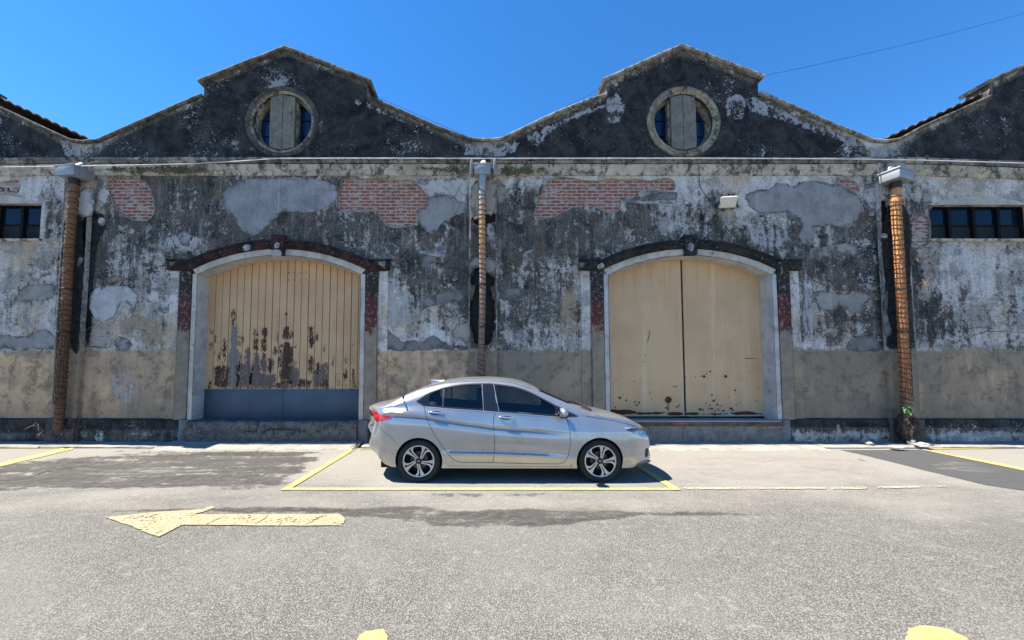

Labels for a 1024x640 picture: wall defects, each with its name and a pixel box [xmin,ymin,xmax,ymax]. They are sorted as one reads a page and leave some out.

flaking render [77,177,155,266]
flaking render [336,178,428,228]
flaking render [534,176,692,219]
leakage [70,212,106,354]
peeling [208,308,356,389]
corrosion [611,371,785,426]